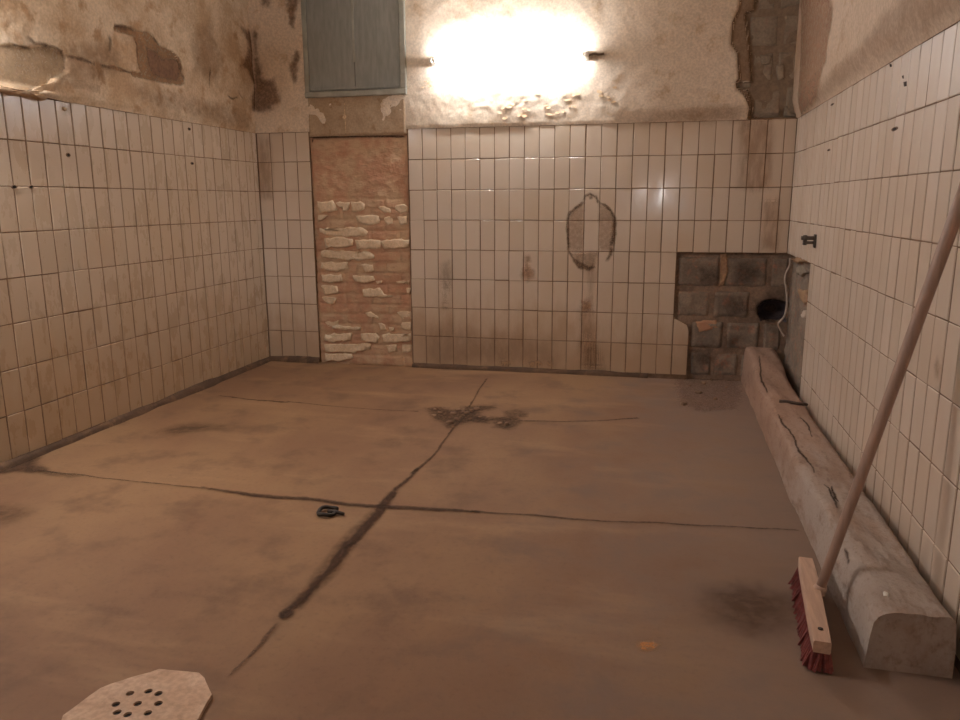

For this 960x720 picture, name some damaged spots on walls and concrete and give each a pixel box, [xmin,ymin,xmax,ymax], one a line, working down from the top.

flaking render [0,25,184,90]
peeling [498,92,580,119]
flaking render [731,0,800,120]
peeling [317,200,410,304]
peeling [324,311,412,362]
spalling [674,252,810,397]
crack [779,416,838,507]
crack [43,379,788,671]